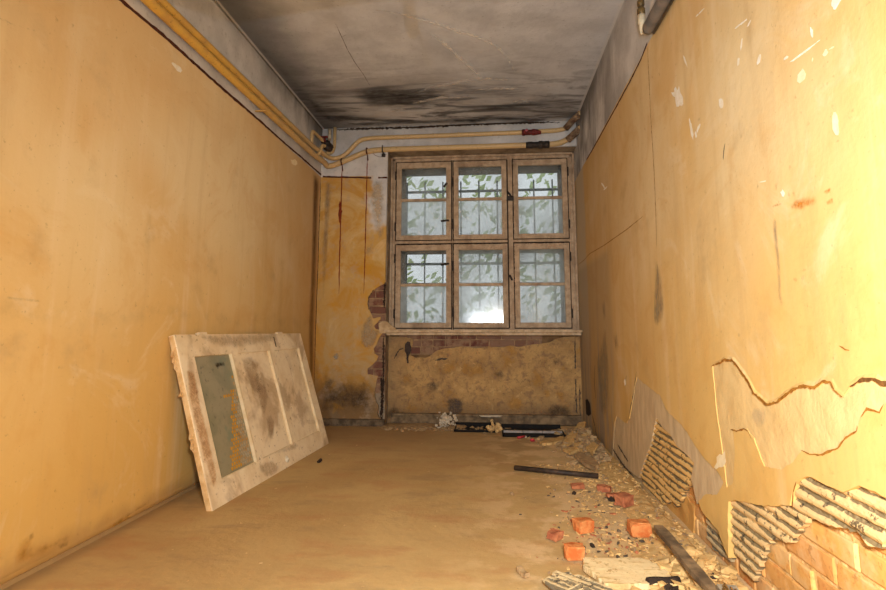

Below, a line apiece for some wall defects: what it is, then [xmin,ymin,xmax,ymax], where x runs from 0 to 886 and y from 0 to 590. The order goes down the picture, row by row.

peeling [784,27,834,62]
peeling [671,87,683,107]
crack [712,356,886,456]
flaking render [613,361,886,590]